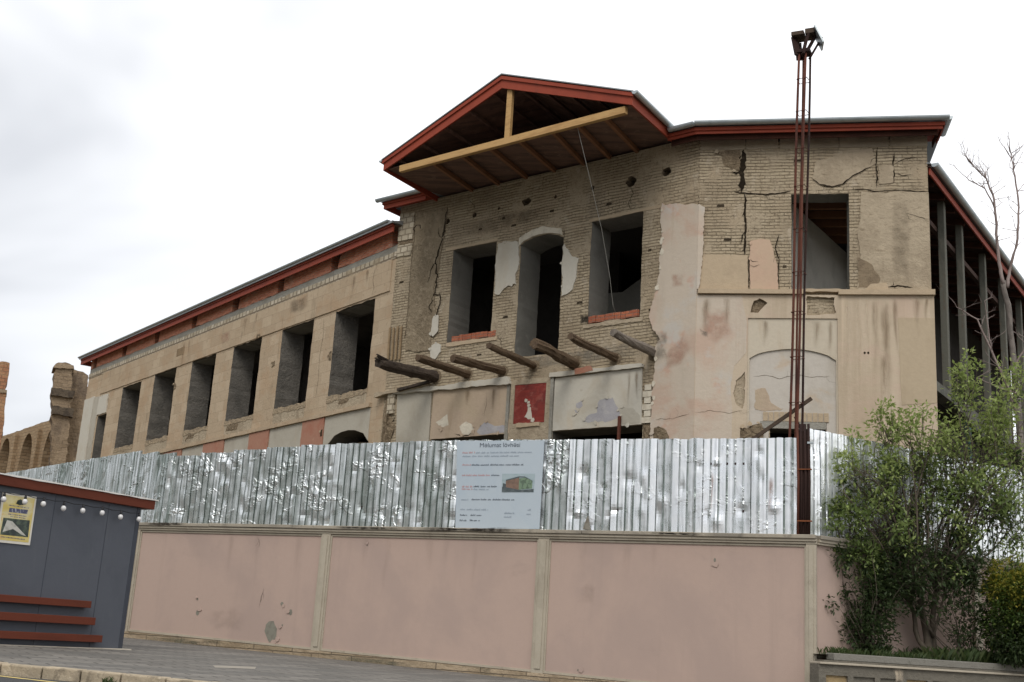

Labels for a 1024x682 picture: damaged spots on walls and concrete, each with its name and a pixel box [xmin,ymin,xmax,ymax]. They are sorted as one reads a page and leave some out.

crack [813,148,928,219]
crack [734,150,790,284]
crack [405,200,480,334]
spalling [751,299,767,313]
spalling [733,372,748,409]
peeling [436,415,504,437]
peeling [572,395,669,440]